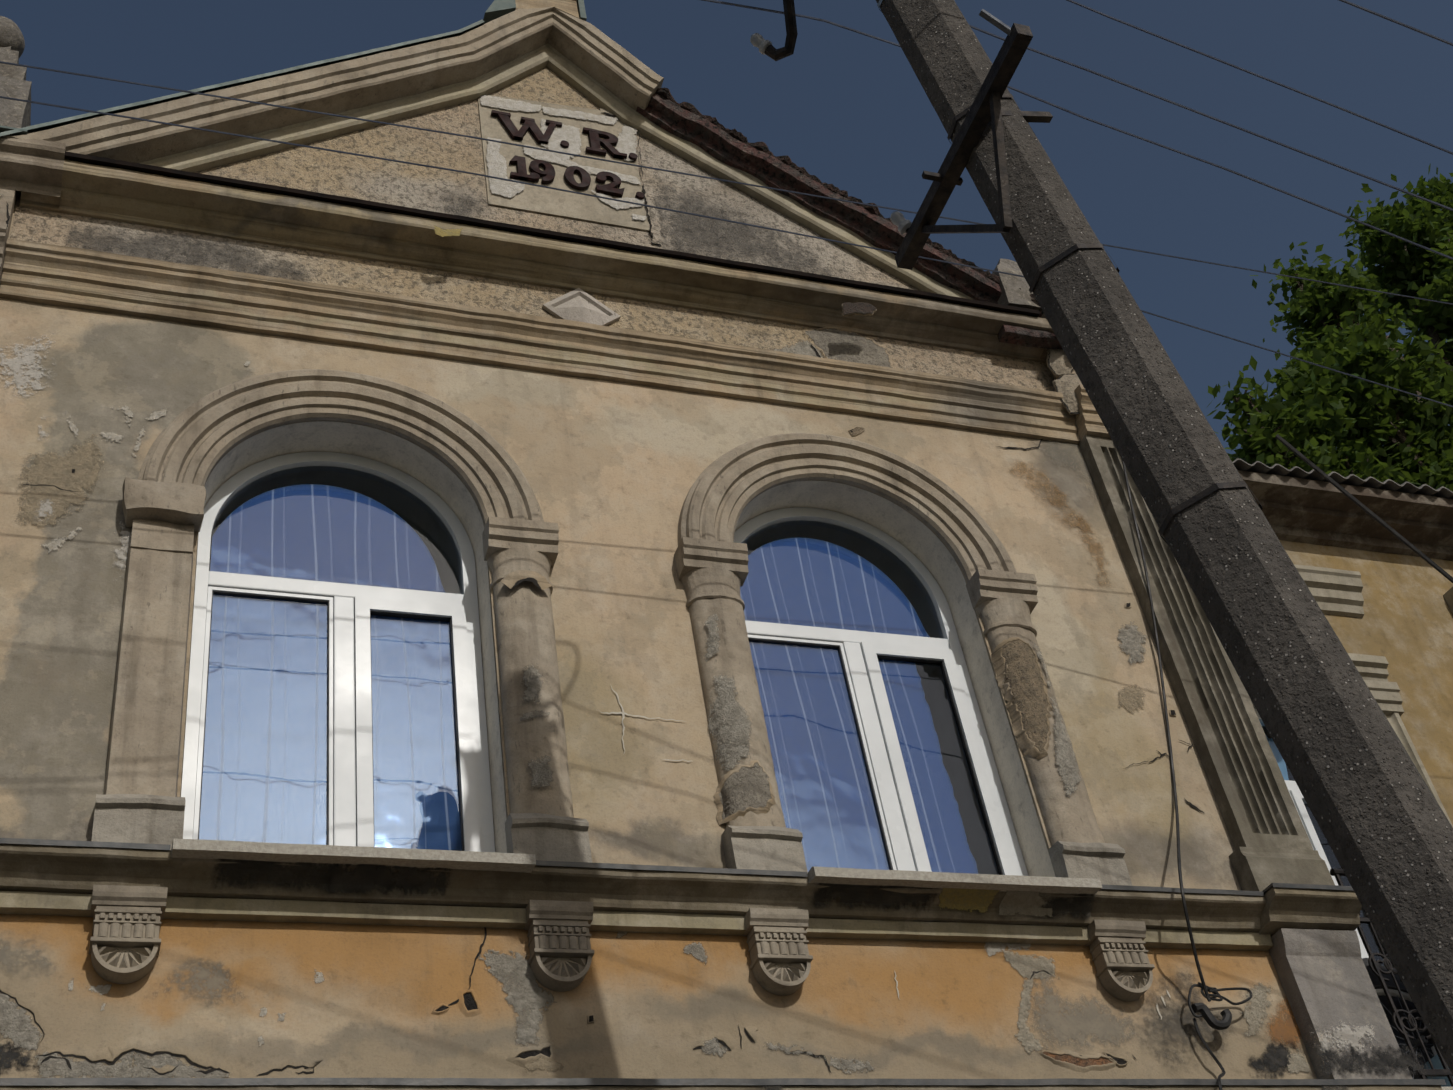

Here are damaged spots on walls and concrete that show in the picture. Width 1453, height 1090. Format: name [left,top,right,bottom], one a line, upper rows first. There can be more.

damp [140,44,973,300]
flaking render [1046,349,1082,415]
peeling [15,409,167,526]
flaking render [991,637,1081,795]
peeling [0,994,229,1078]
crack [0,972,323,1076]
crack [448,927,487,1006]
spalling [457,989,483,1018]
peeling [479,949,563,1072]
crack [767,1039,874,1074]
peeling [985,942,1136,1073]